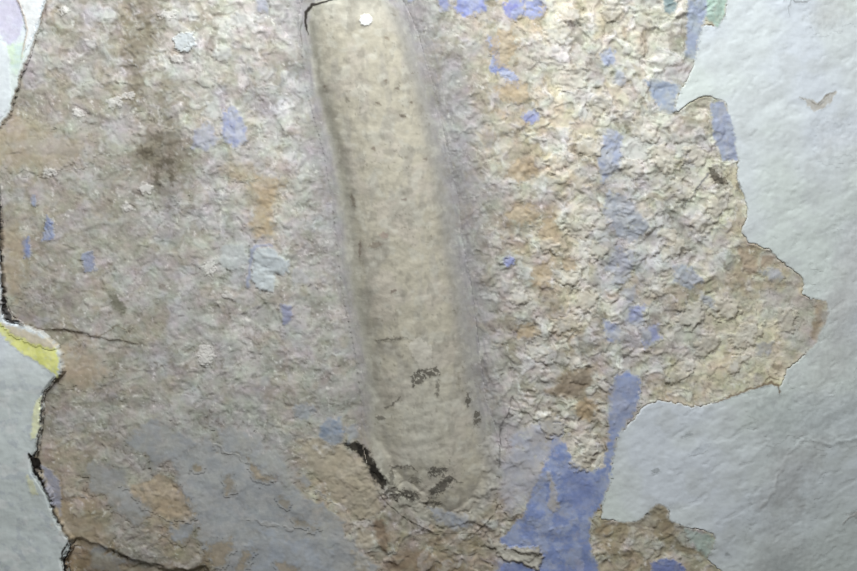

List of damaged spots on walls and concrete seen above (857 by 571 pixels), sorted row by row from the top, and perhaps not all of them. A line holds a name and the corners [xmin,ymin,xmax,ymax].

crack [0,0,48,127]
crack [299,0,335,48]
peeling [798,90,838,113]
crack [0,190,8,228]
crack [0,255,142,346]
spalling [0,0,535,571]
spalling [402,0,813,520]
peeling [499,368,721,571]